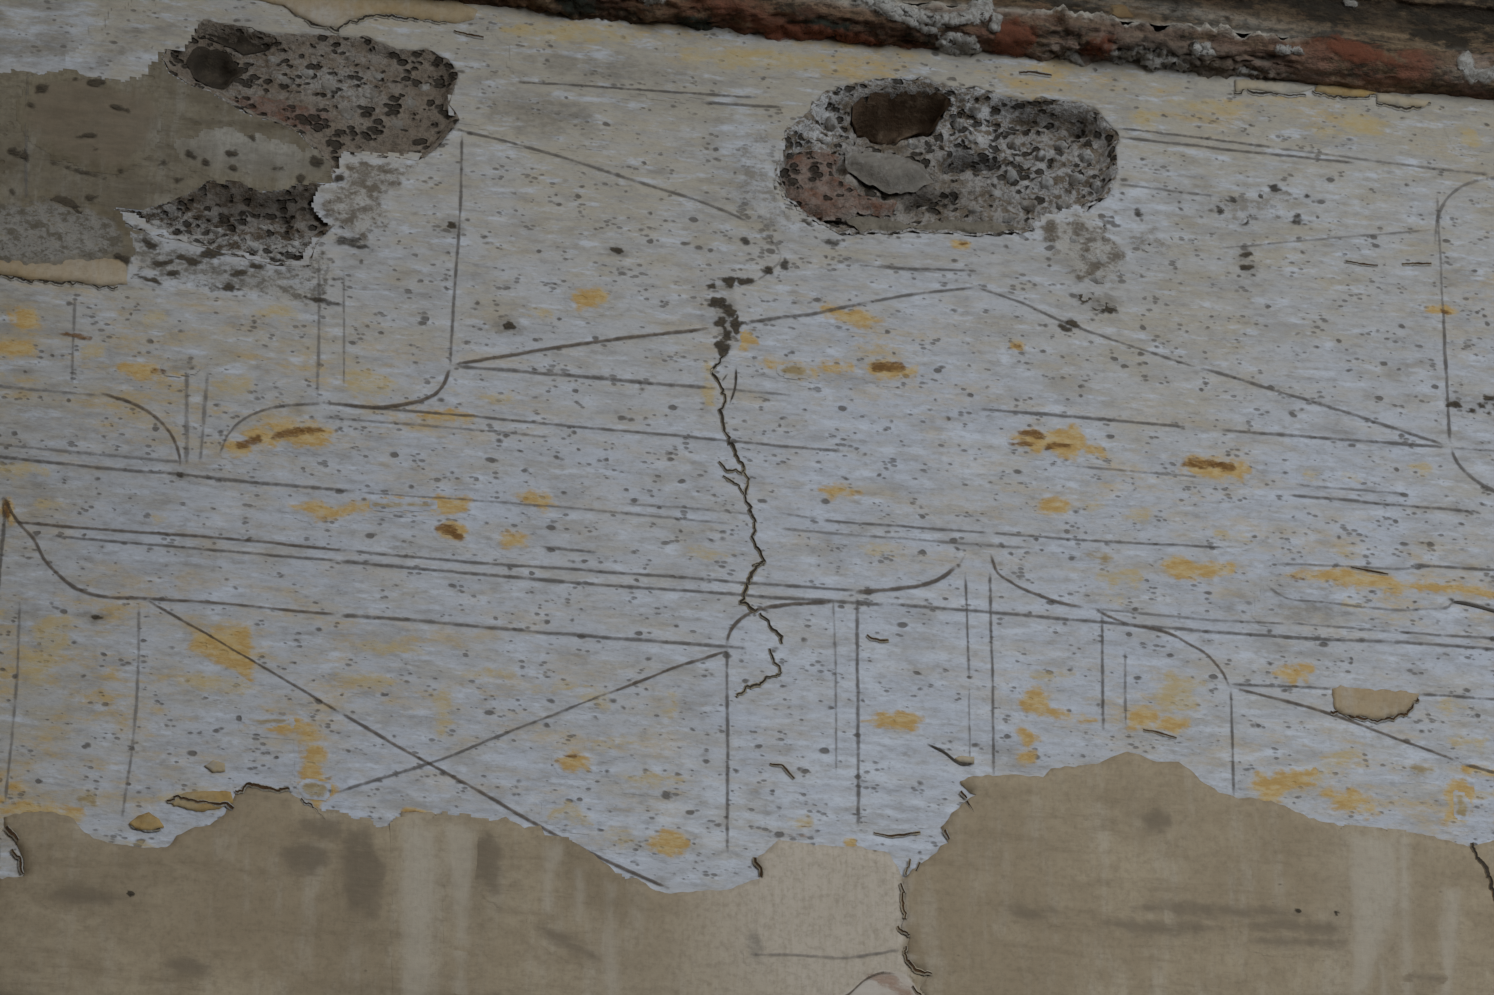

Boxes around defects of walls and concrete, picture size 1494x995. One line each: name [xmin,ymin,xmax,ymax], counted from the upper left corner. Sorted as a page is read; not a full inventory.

spalling [0,0,478,314]
spalling [485,308,534,345]
peeling [491,14,655,48]
peeling [565,234,642,318]
spalling [675,1,1431,422]
crack [710,353,784,698]
flaking render [0,616,394,995]
crack [874,790,974,995]
flaking render [475,657,1494,995]
crack [1470,842,1494,901]